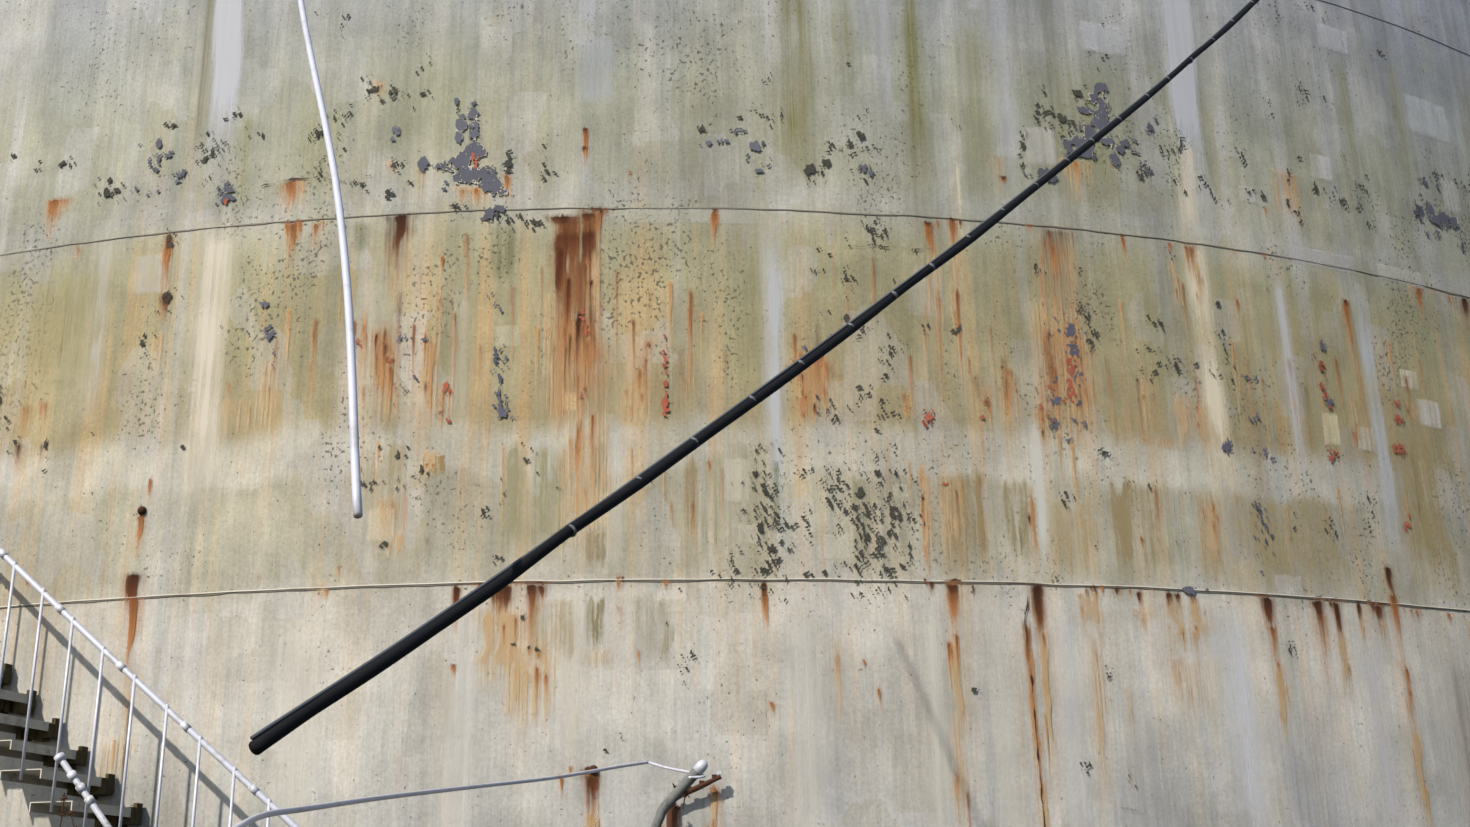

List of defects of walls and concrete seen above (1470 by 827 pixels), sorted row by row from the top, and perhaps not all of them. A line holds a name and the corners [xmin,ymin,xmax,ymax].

peeling [94,107,264,205]
peeling [306,53,433,187]
peeling [344,98,547,230]
peeling [1018,50,1266,206]
peeling [1312,174,1375,228]
peeling [1414,164,1470,252]
rust [535,208,617,530]
rust [125,573,140,661]
rust [478,581,547,709]
rust [924,578,974,719]
rust [1032,585,1053,765]
rust [1312,567,1421,680]